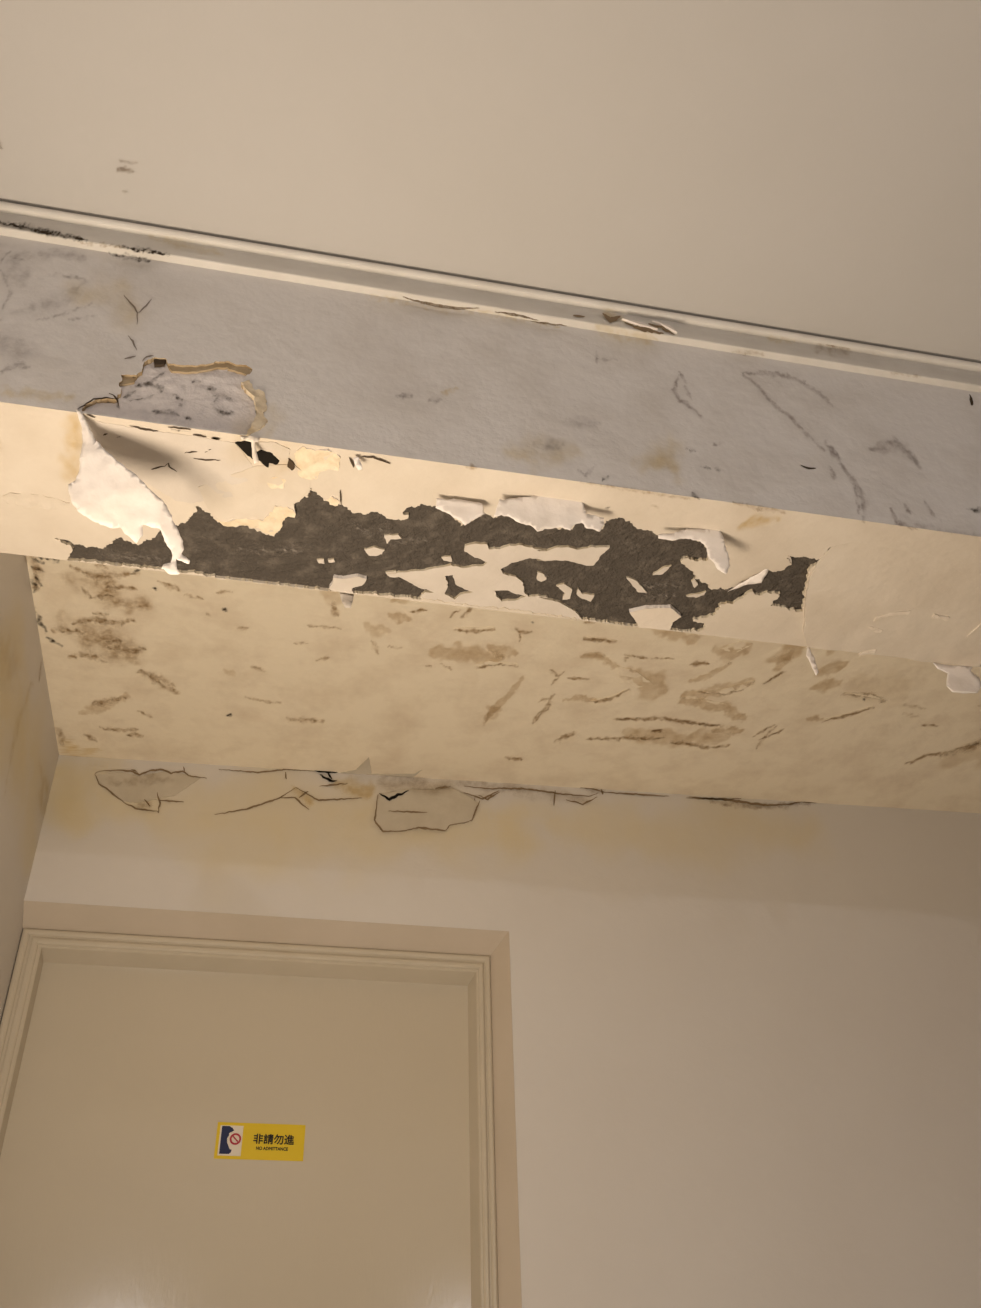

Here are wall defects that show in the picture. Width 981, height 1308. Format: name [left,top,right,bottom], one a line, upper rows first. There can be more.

leakage [0,221,84,241]
leakage [109,246,165,262]
spalling [62,359,819,631]
peeling [933,663,981,694]